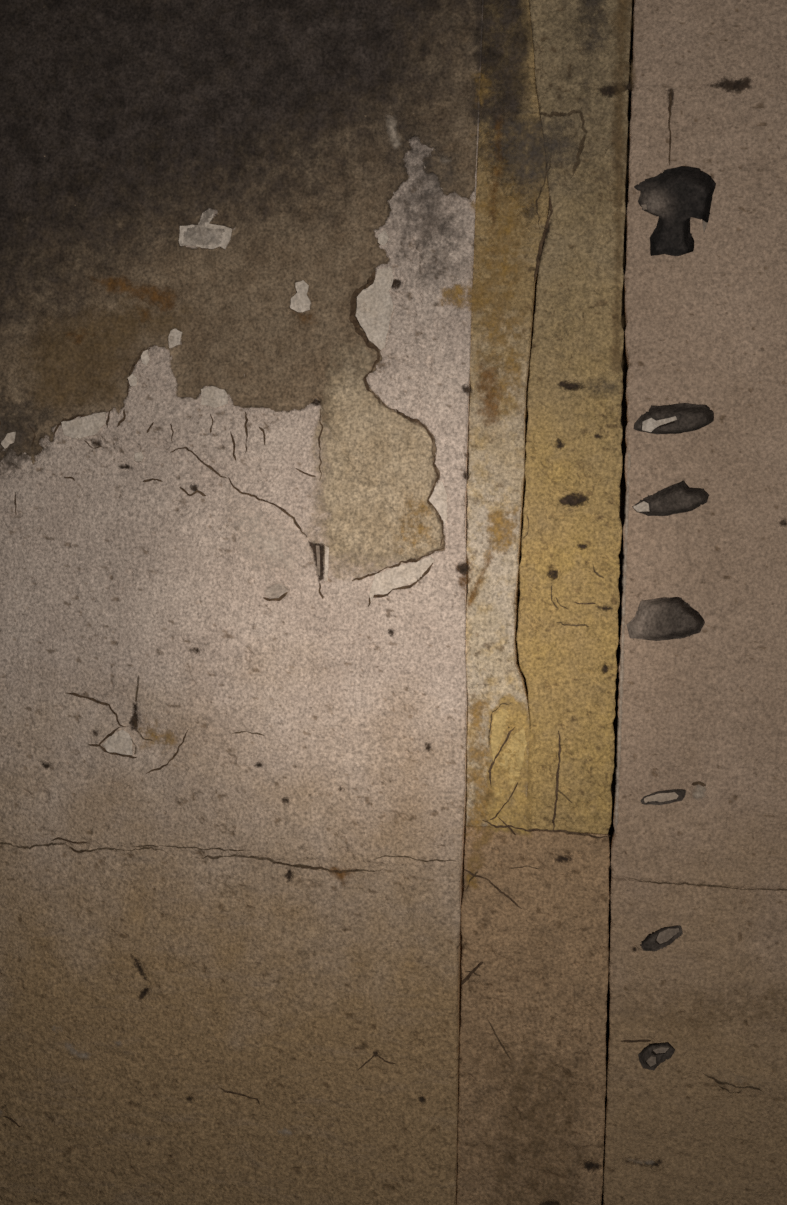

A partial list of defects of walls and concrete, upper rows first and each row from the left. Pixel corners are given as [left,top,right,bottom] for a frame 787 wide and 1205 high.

damp [473,0,587,189]
damp [600,0,634,230]
damp [401,148,453,246]
spalling [634,166,716,256]
peeling [0,0,482,601]
damp [0,309,177,469]
crack [170,431,236,478]
spalling [633,403,714,434]
spalling [597,453,709,826]
crack [482,731,609,838]
crack [0,837,538,909]
spalling [633,925,683,951]